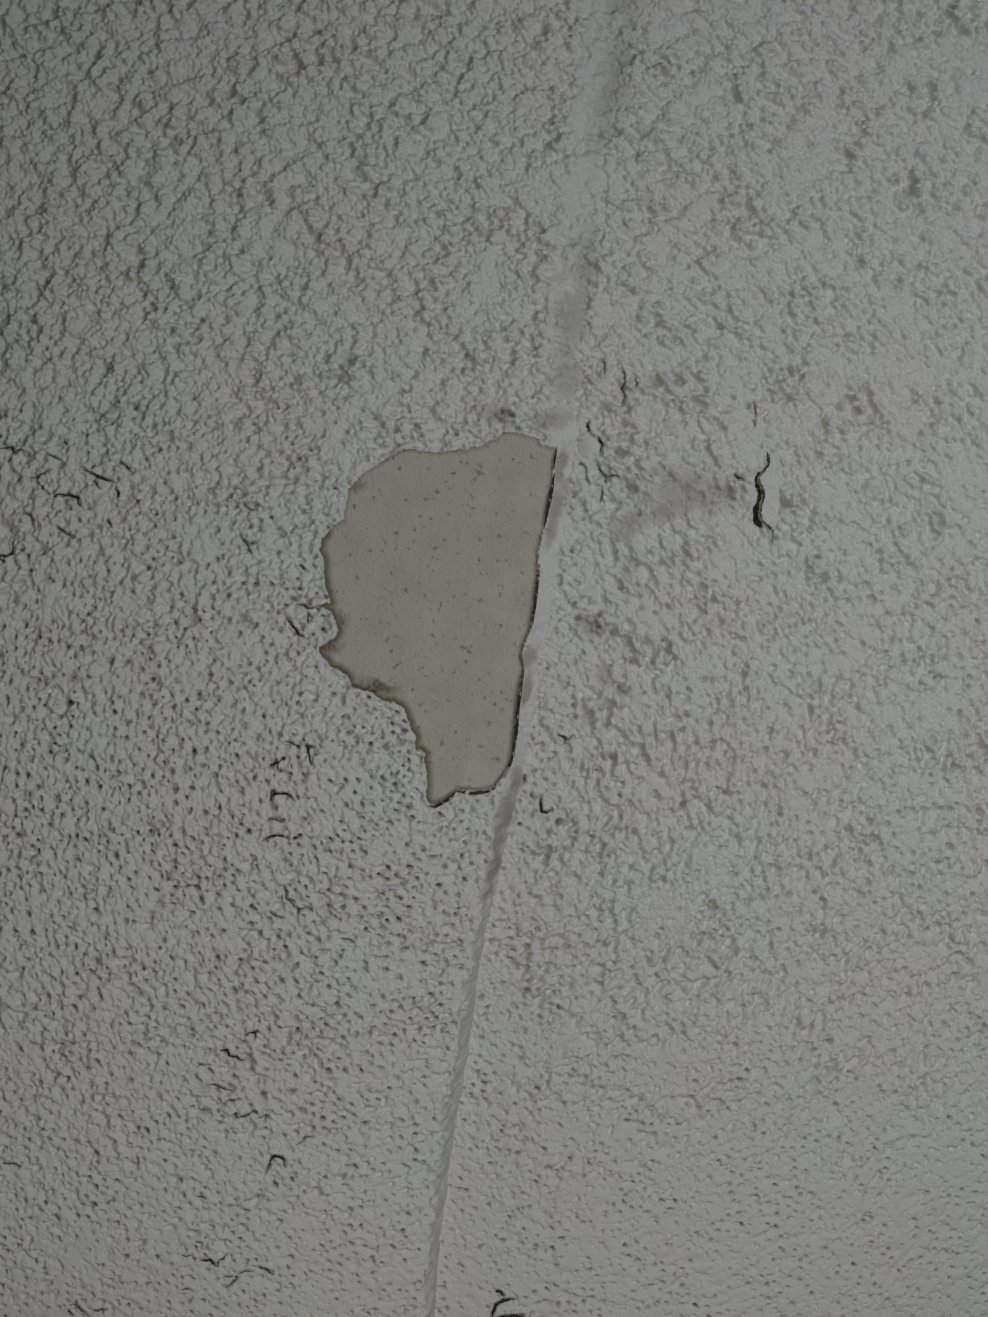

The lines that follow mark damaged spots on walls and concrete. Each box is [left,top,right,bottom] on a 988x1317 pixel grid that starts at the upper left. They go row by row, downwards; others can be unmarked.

peeling [315,429,559,809]
crack [524,776,553,814]
crack [491,1290,524,1317]